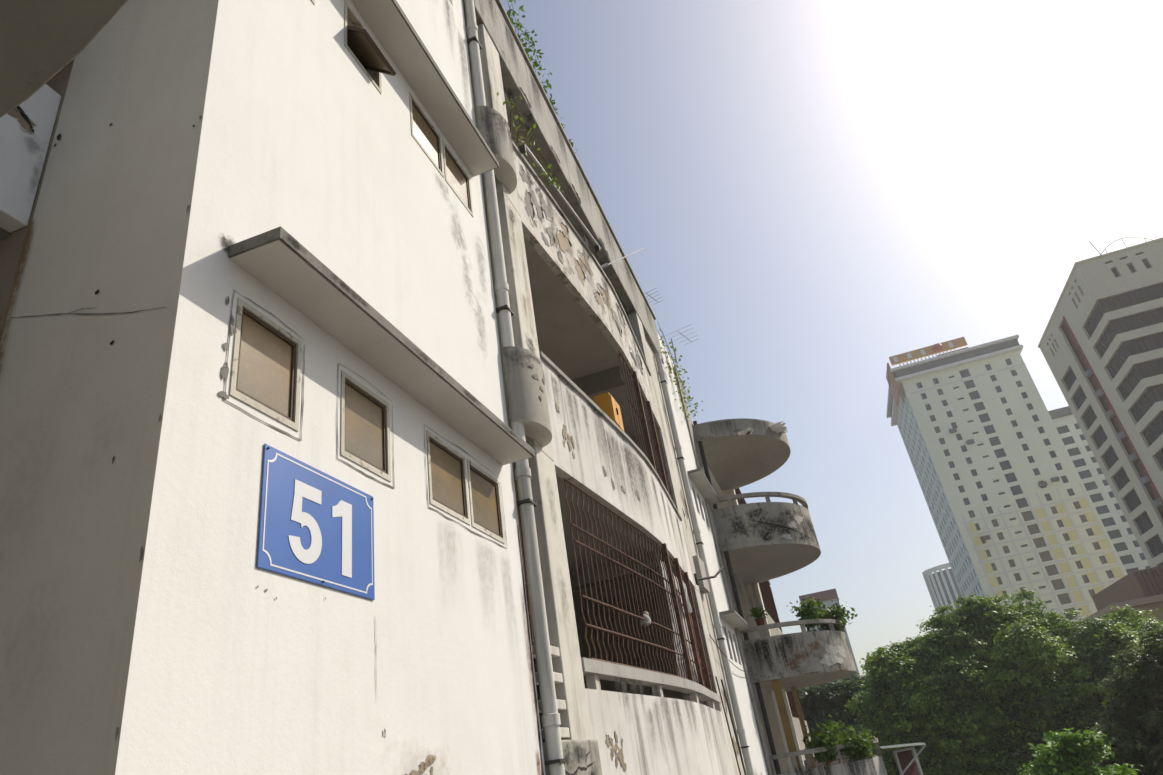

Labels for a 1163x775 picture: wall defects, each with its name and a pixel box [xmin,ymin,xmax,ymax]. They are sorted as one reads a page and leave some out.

spalling [8,108,36,134]
peeling [519,164,644,375]
crack [10,307,164,318]
water stain [544,377,682,539]
mould [731,509,818,545]
peeling [820,644,846,667]
peeling [404,754,436,775]
peeling [606,731,627,772]